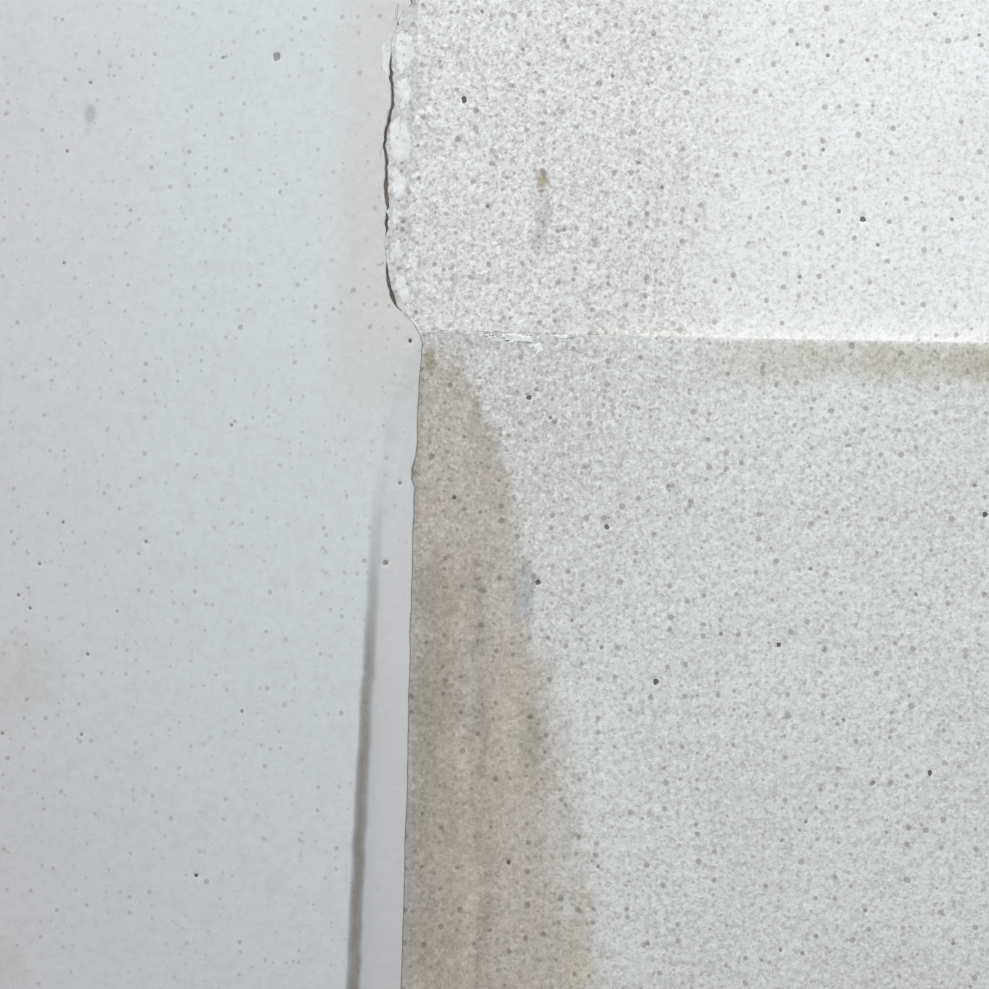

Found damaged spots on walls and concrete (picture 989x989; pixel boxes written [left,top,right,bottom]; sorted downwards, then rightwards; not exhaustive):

crack [380,53,394,235]
crack [377,263,422,522]
leakage [402,380,560,989]